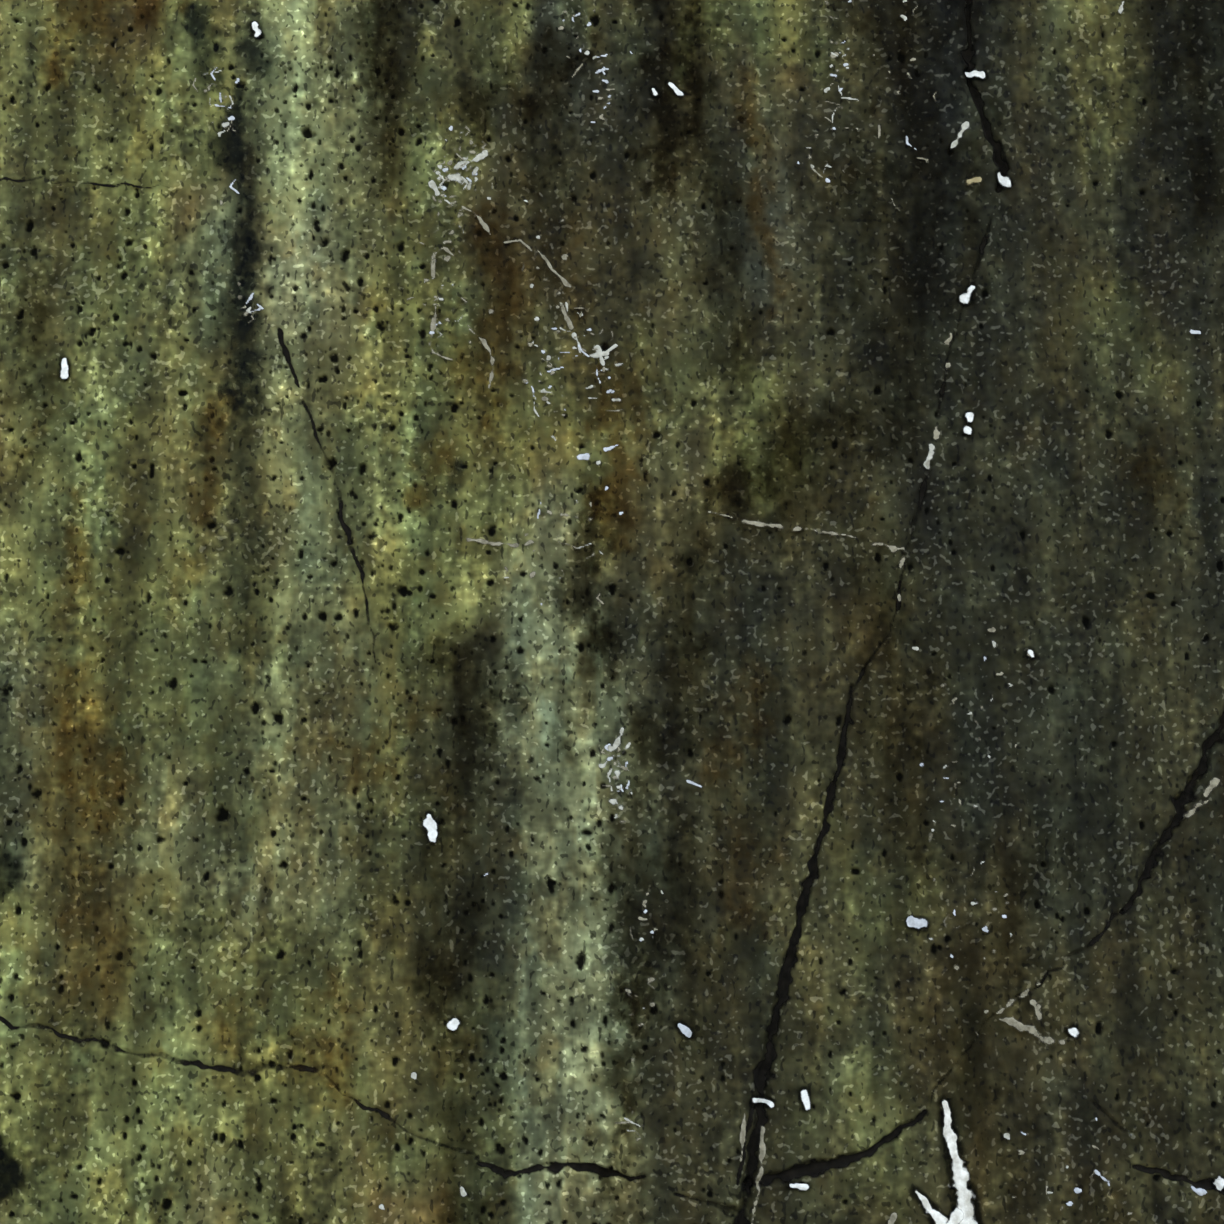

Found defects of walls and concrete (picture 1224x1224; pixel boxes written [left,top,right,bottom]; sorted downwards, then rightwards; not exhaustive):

crack [960,0,1010,193]
crack [0,177,155,188]
crack [971,224,990,285]
crack [938,313,961,410]
crack [278,328,376,663]
crack [674,469,972,1224]
crack [1015,712,1224,997]
leakage [0,1136,24,1199]
crack [0,1016,646,1181]
crack [1132,1165,1224,1194]